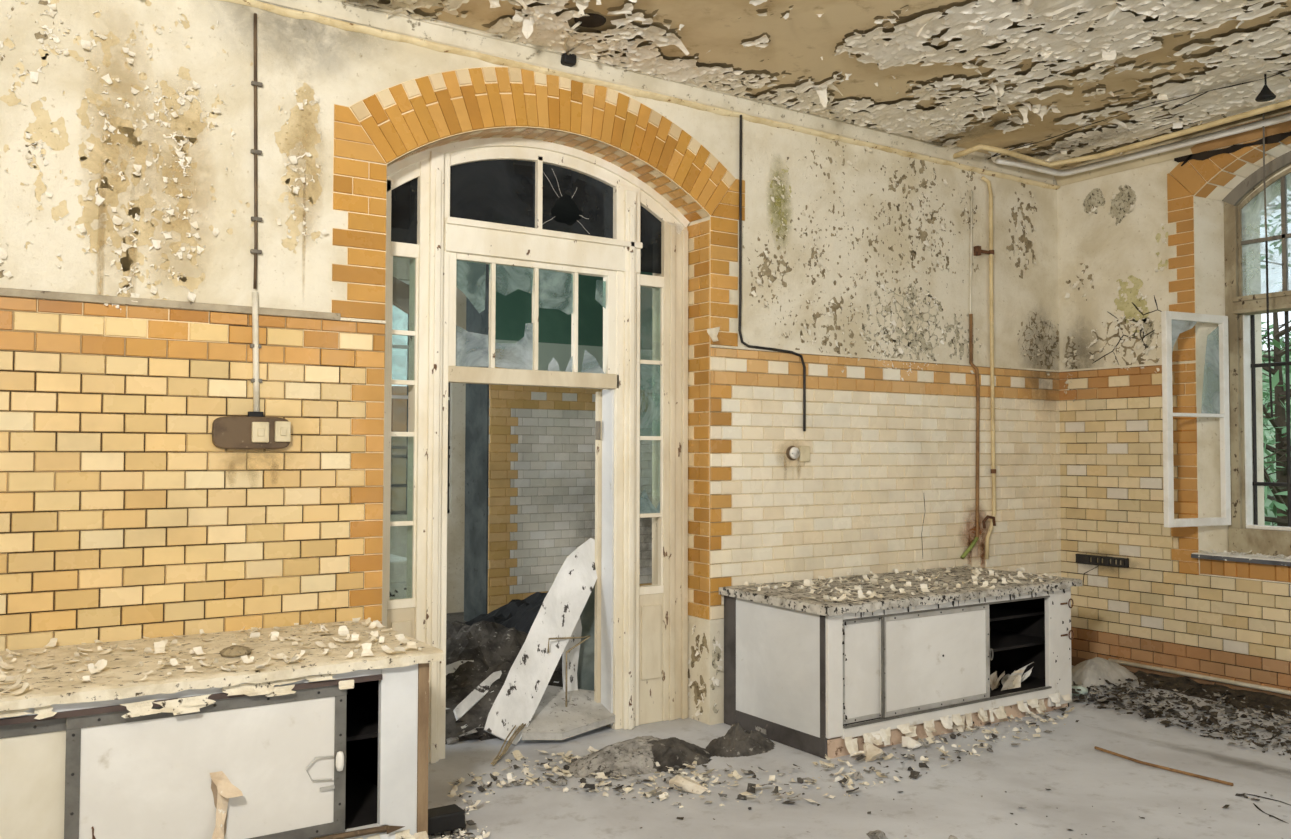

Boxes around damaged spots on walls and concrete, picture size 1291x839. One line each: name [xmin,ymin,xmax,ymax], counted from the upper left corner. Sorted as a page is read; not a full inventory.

peeling [0,0,254,311]
leakage [167,156,191,190]
peeling [274,82,329,254]
leakage [772,184,787,227]
rust [966,514,985,564]